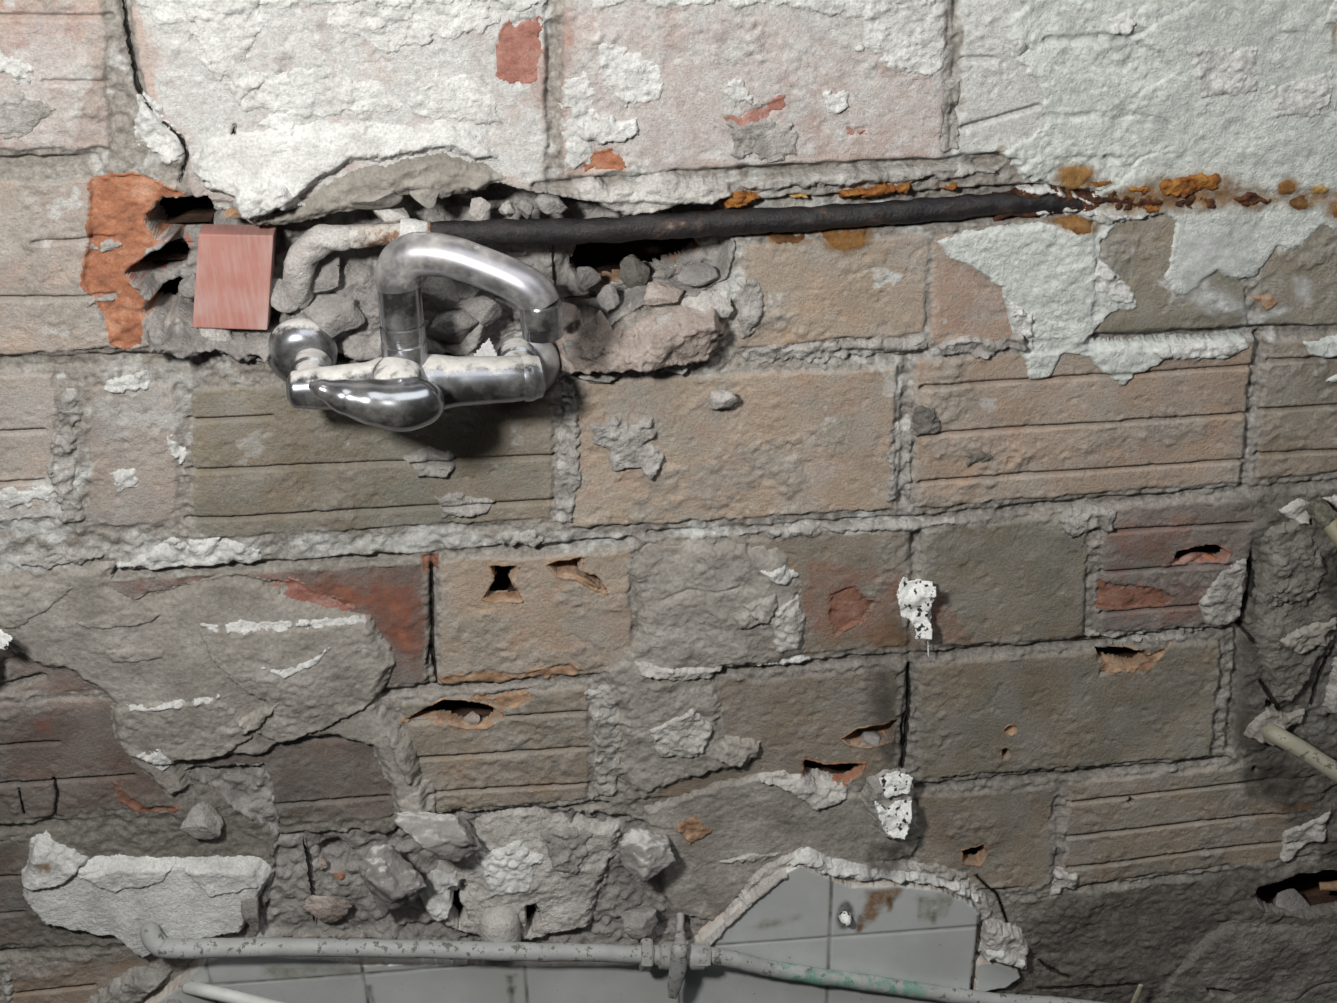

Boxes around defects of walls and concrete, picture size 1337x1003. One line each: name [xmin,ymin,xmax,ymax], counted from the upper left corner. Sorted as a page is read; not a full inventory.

crack [122,0,188,183]
flaking render [80,118,736,350]
flaking render [934,0,1337,386]
corrosion [992,166,1337,235]
crack [426,562,437,683]
peeling [650,708,914,840]
crack [900,662,912,768]
peeling [896,577,936,657]
crack [1235,552,1256,644]
crack [1260,647,1332,711]
spalling [22,762,481,941]
spalling [479,804,698,945]